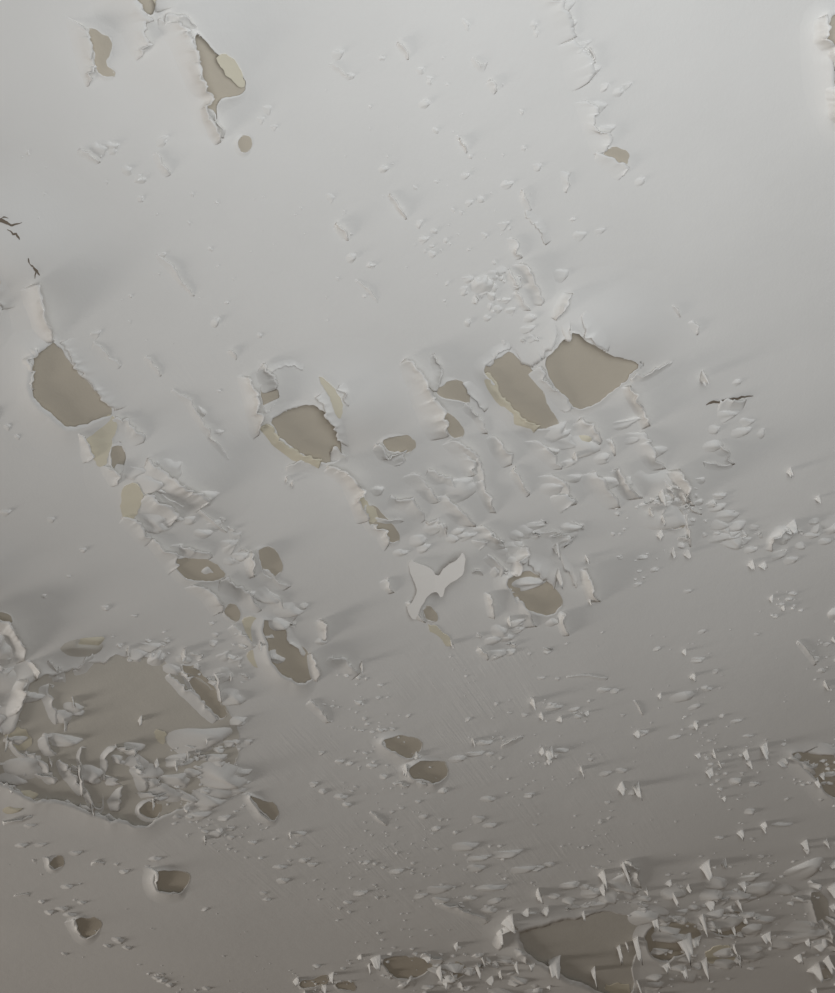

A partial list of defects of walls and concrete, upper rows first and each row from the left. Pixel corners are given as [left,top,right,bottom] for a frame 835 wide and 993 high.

peeling [65,0,252,157]
peeling [530,0,633,181]
peeling [800,0,835,151]
peeling [0,270,835,993]